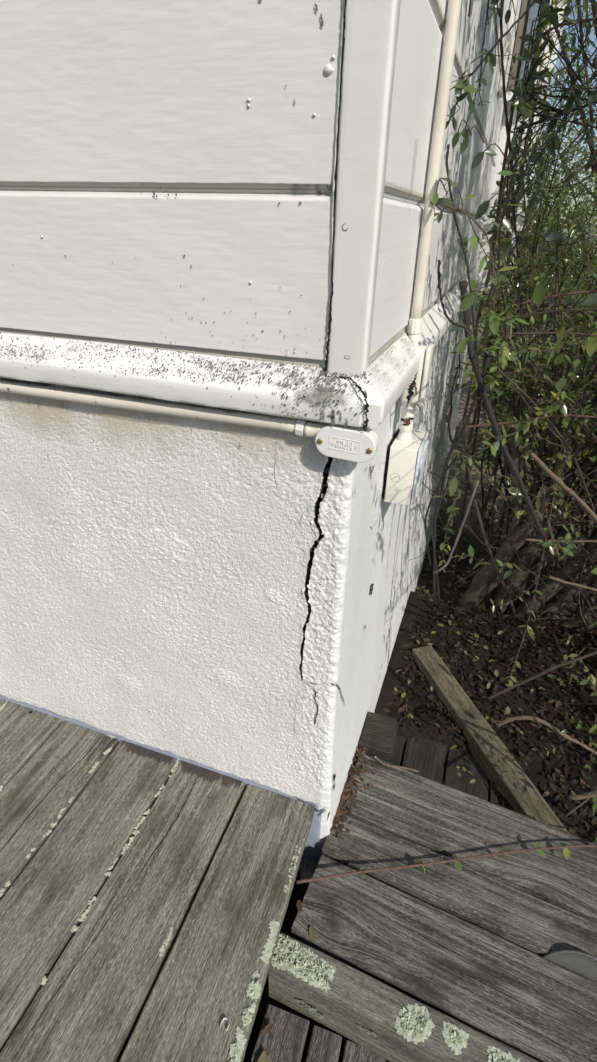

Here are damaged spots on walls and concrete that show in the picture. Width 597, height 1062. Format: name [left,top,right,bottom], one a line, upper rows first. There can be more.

damp [0,332,415,427]
crack [294,457,345,737]